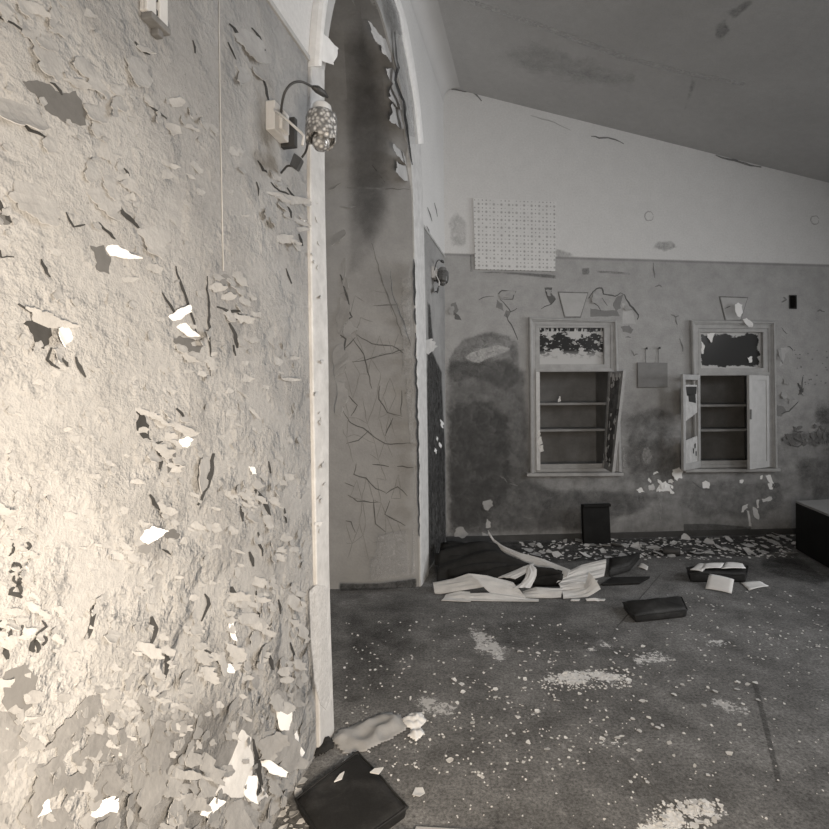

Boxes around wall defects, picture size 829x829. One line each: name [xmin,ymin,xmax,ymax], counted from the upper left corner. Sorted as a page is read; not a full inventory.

peeling [0,0,86,138]
peeling [86,188,171,274]
peeling [256,161,320,251]
peeling [17,303,86,378]
peeling [162,266,255,376]
peeling [136,408,199,487]
peeling [197,453,215,506]
crack [339,245,420,561]
damp [427,352,472,566]
flaking render [637,467,683,494]
flaking render [741,475,780,526]
peeling [0,466,329,829]